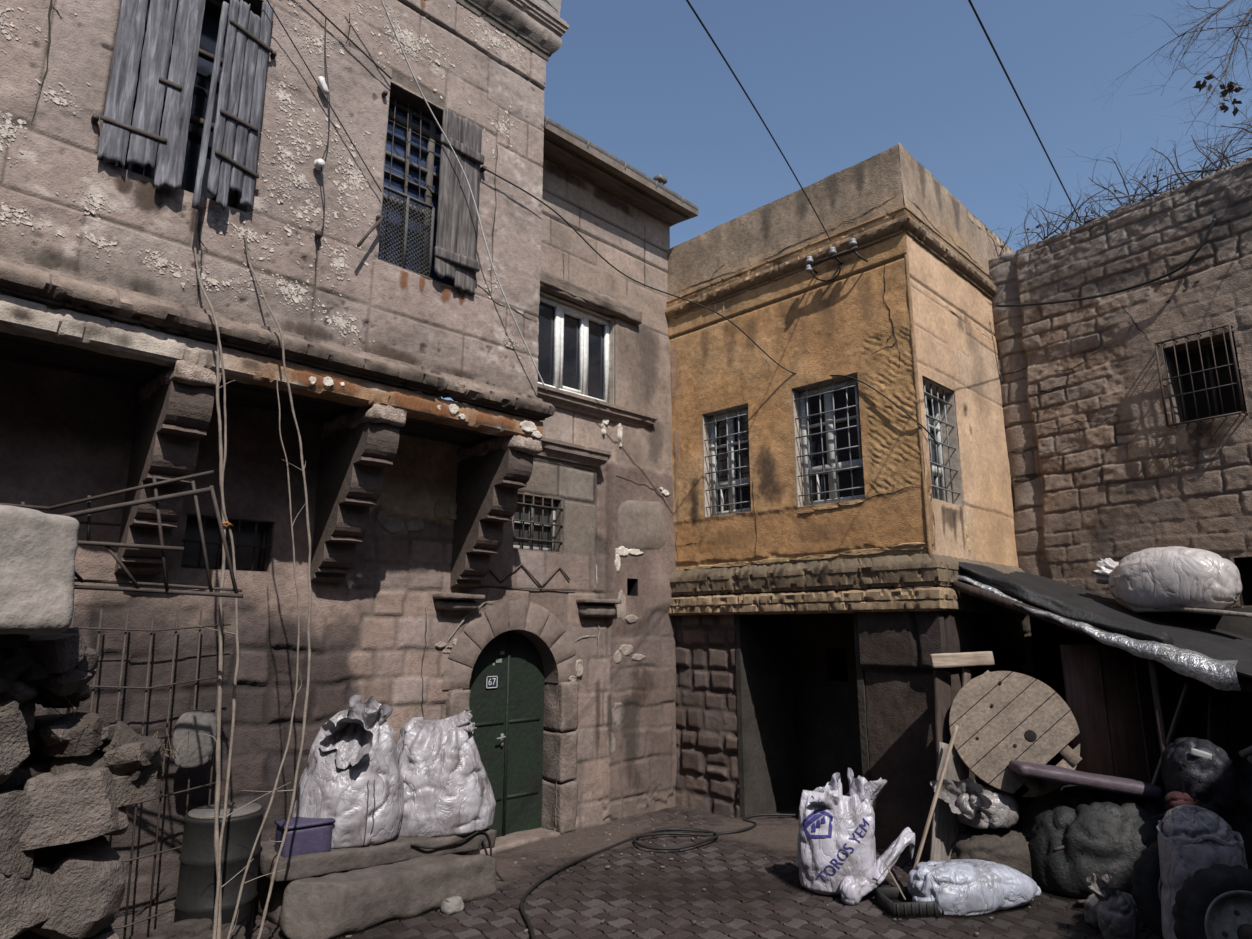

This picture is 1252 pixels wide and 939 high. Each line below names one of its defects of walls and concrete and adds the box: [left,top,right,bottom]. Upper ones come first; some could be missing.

leakage [117,175,168,210]
leakage [191,207,204,231]
rust [401,271,425,290]
crack [872,265,900,364]
leakage [288,324,332,338]
leakage [373,346,416,362]
peeling [309,376,345,388]
peeling [437,404,466,420]
leakage [759,452,781,500]
peeling [615,546,644,572]
peeling [617,589,639,623]
peeling [614,644,645,664]